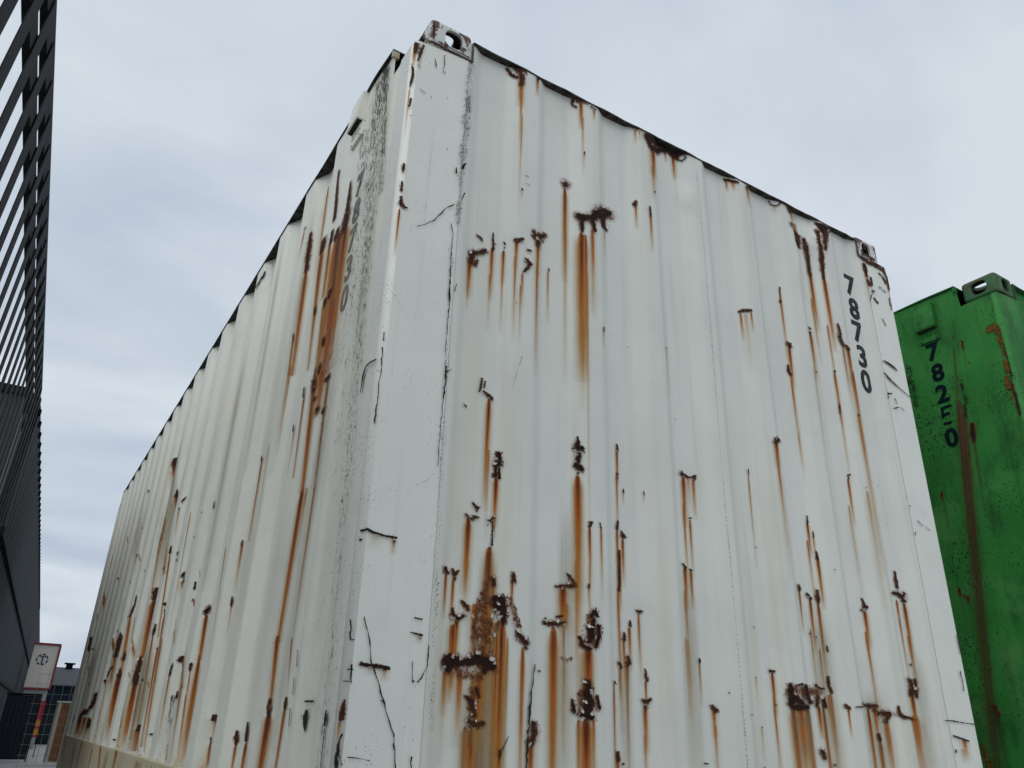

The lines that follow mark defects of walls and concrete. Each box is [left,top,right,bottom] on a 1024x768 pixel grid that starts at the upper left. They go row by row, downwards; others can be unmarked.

rust [62,489,211,768]
rust [257,170,352,768]
crack [334,616,396,768]
rust [478,377,504,518]
rust [467,229,550,318]
rust [506,67,540,144]
rust [438,437,653,768]
rust [560,178,616,356]
rust [633,128,687,193]
rust [678,469,701,685]
rust [768,200,871,513]
rust [769,516,923,768]